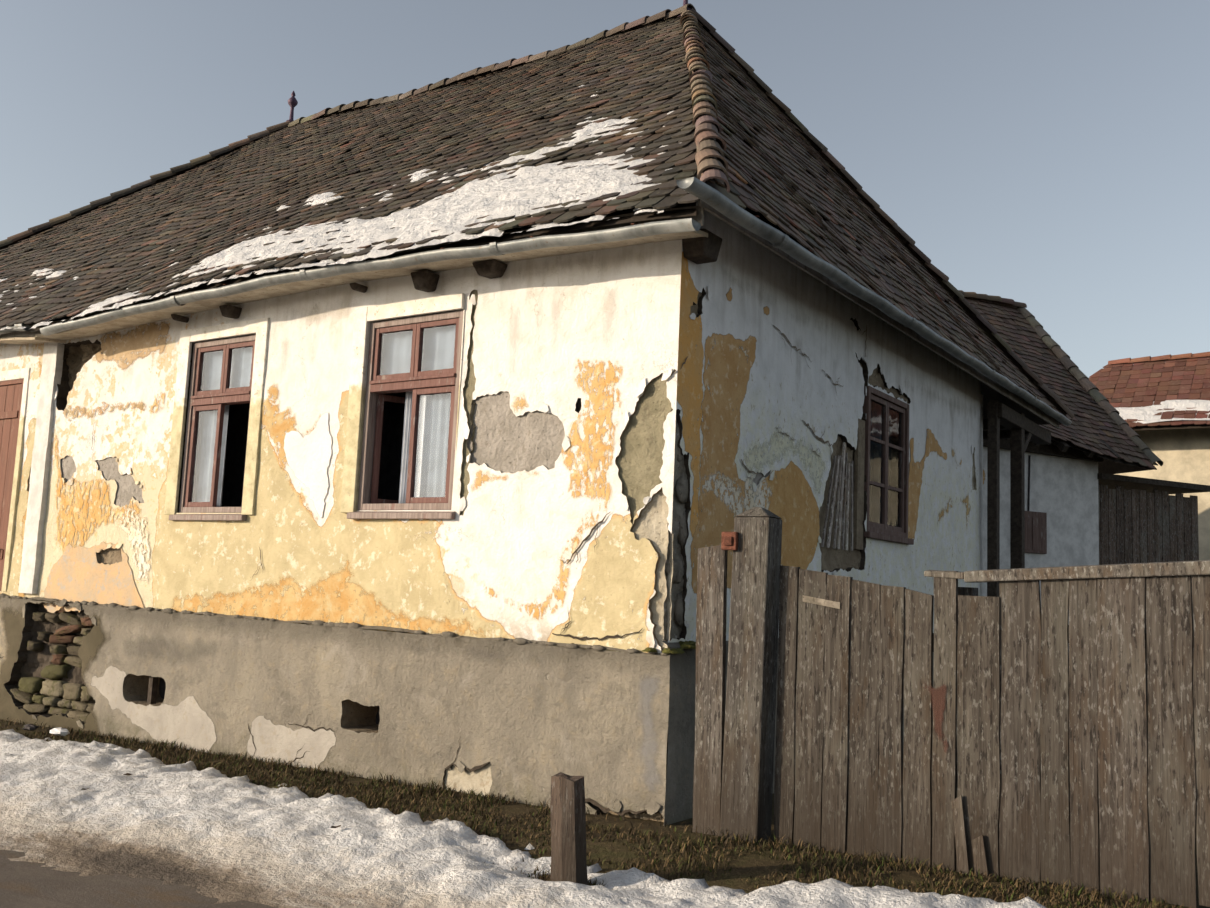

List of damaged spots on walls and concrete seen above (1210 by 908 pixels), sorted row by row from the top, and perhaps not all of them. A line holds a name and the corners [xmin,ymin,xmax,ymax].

crack [773,325,843,393]
spalling [855,352,911,404]
peeling [0,252,867,729]
peeling [908,429,985,539]